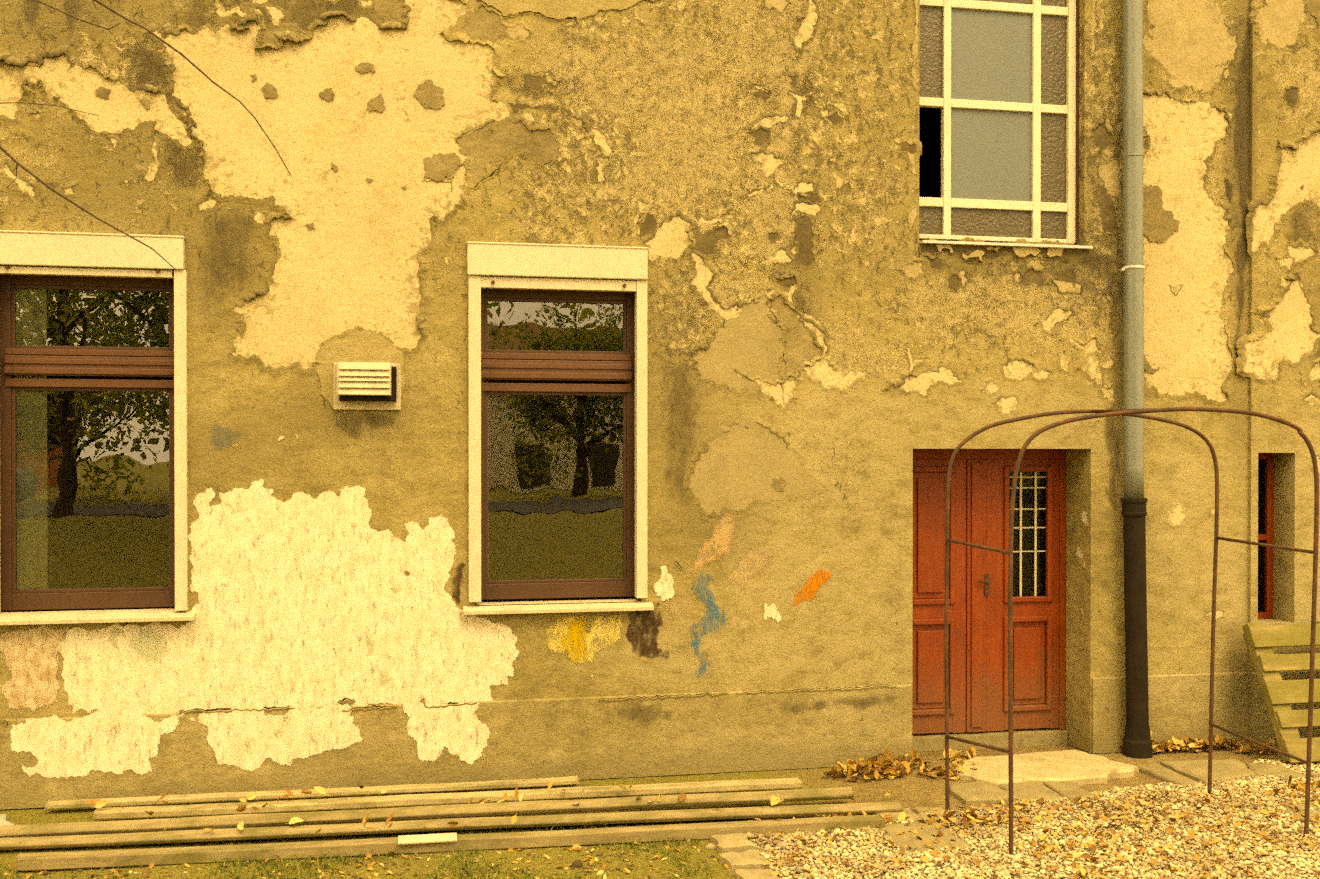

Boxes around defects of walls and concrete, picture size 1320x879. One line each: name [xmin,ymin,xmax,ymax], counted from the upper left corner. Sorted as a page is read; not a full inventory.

flaking render [0,0,1123,523]
flaking render [1143,0,1320,416]